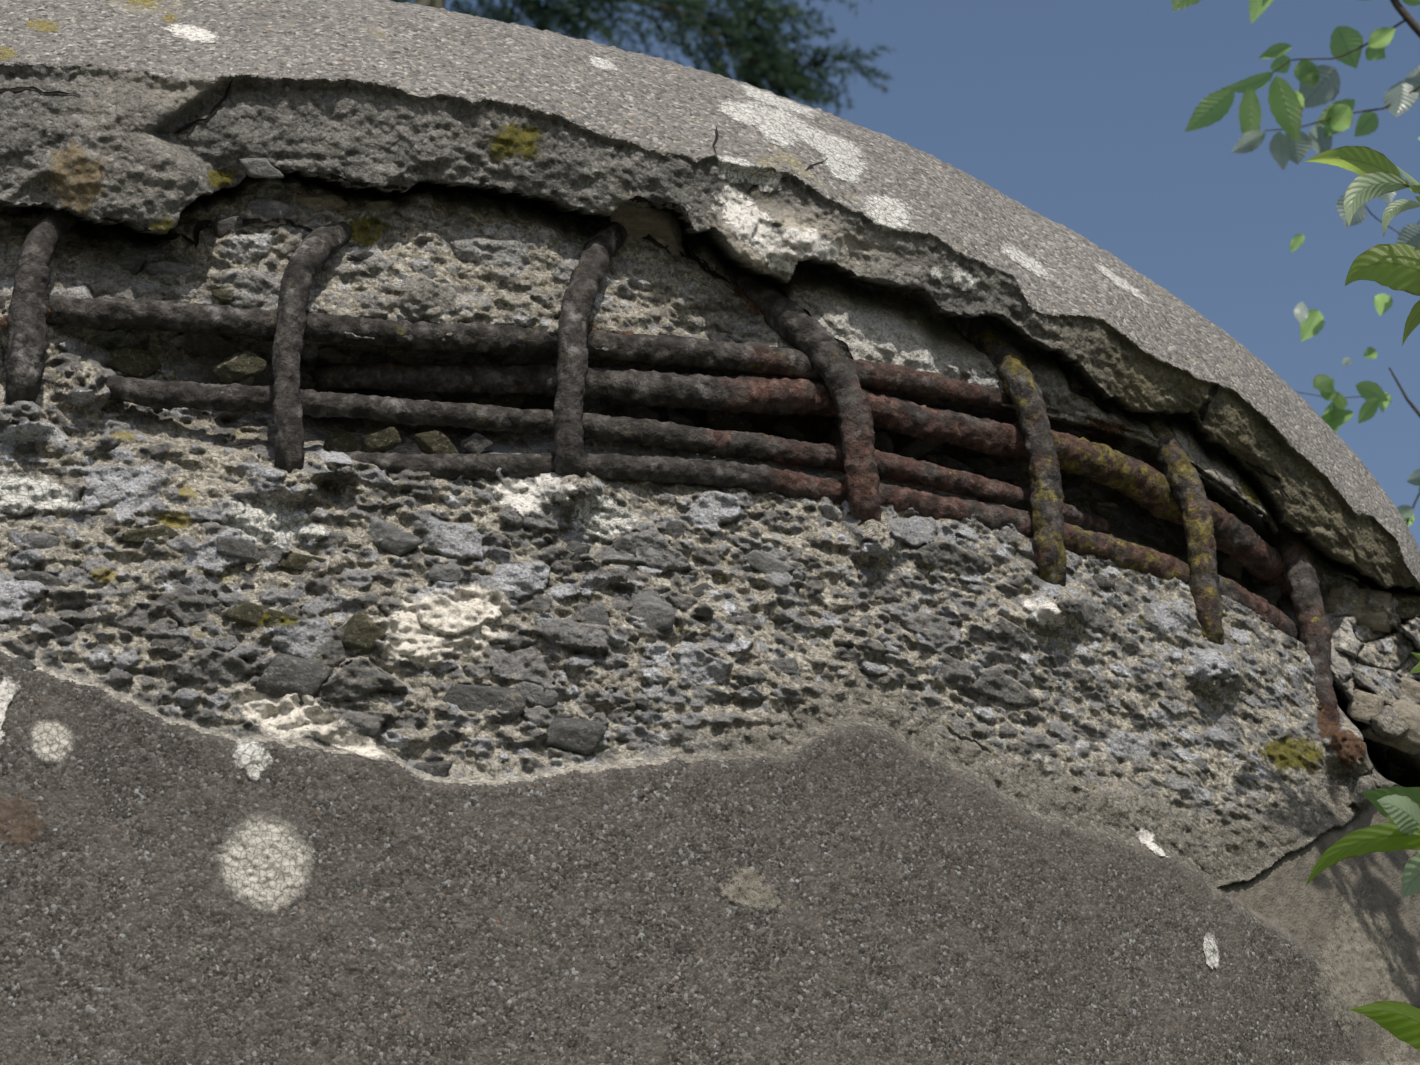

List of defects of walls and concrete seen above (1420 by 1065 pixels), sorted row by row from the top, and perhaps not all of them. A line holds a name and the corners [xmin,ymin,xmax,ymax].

crack [0,86,81,96]
crack [174,78,234,133]
crack [712,126,720,155]
crack [748,158,828,191]
crack [0,204,313,248]
crack [282,170,731,284]
crack [774,282,854,360]
spalling [0,63,1420,891]
rust [1081,417,1132,447]
crack [1189,383,1291,536]
efflorescence [0,677,21,744]
rust [1316,703,1366,769]